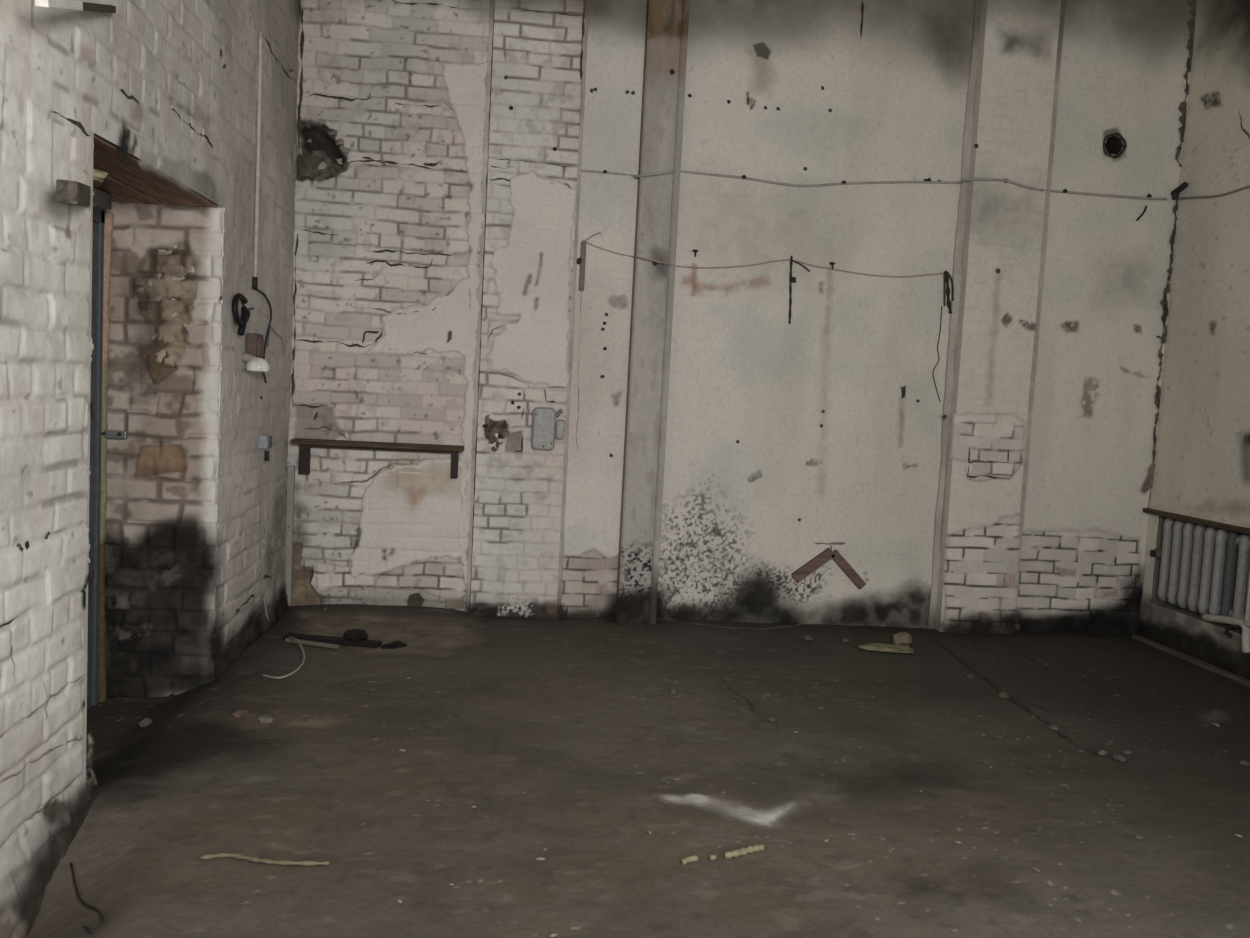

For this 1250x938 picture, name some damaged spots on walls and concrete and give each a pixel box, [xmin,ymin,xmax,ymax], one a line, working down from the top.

crack [51,110,90,136]
crack [120,89,140,104]
spalling [296,120,351,181]
spalling [134,242,197,384]
spalling [483,415,523,453]
spalling [951,413,1025,481]
spalling [236,494,467,635]
mould [669,495,737,603]
mould [757,571,824,597]
spalling [943,515,1140,628]
crack [0,616,86,783]
crack [0,774,81,847]